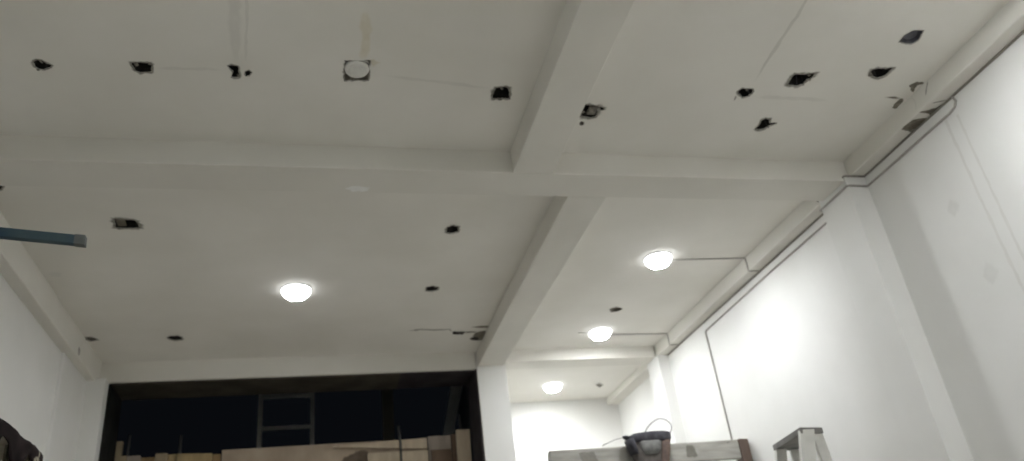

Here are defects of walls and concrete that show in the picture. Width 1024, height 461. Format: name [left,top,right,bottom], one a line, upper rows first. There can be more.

flaking render [884,80,947,133]